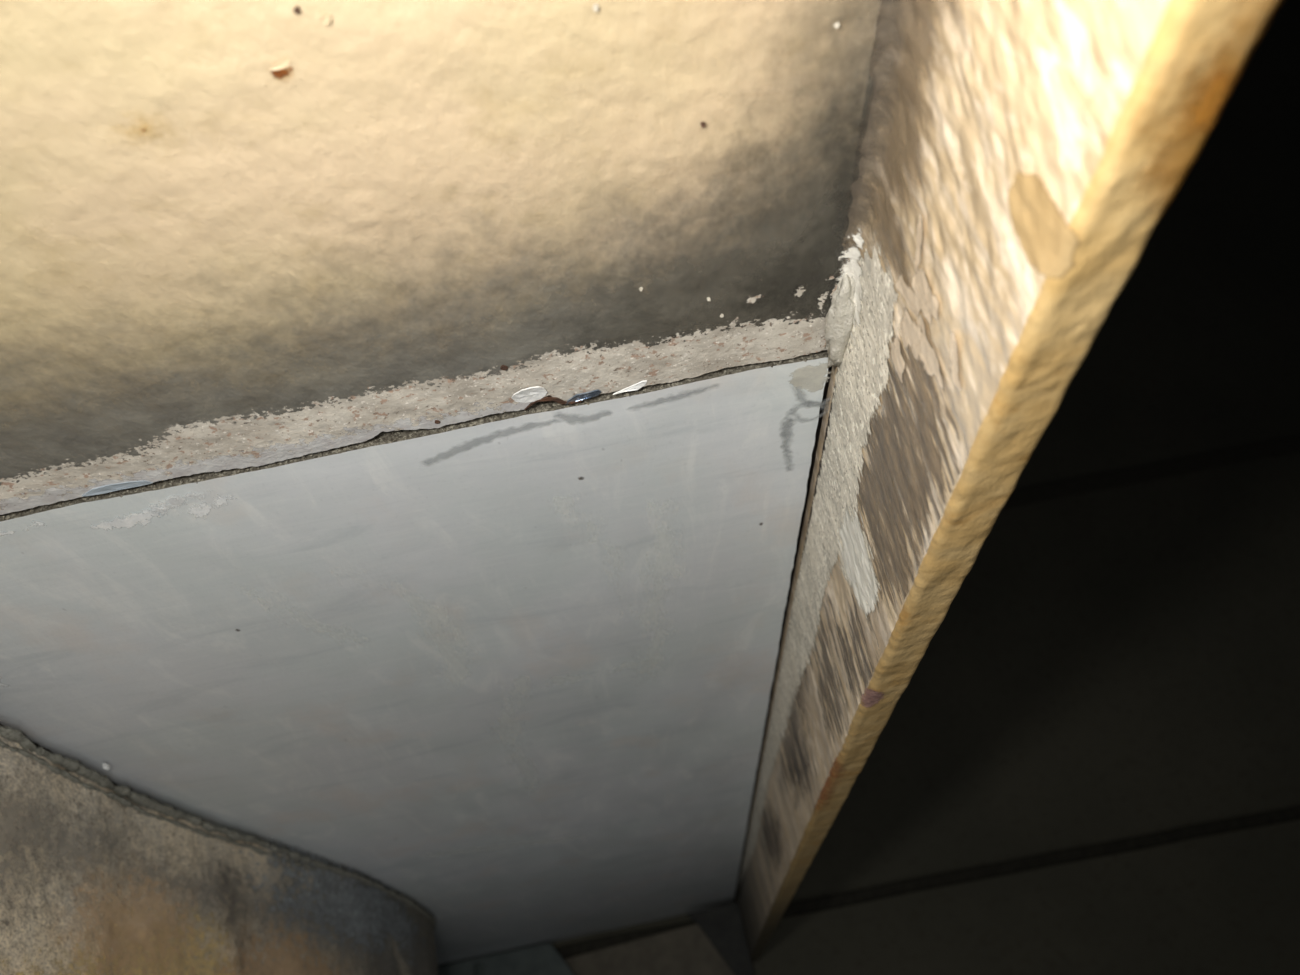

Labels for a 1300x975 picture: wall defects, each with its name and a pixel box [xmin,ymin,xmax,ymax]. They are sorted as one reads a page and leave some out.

rust [271,68,293,79]
damp [755,147,859,313]
peeling [738,230,898,888]